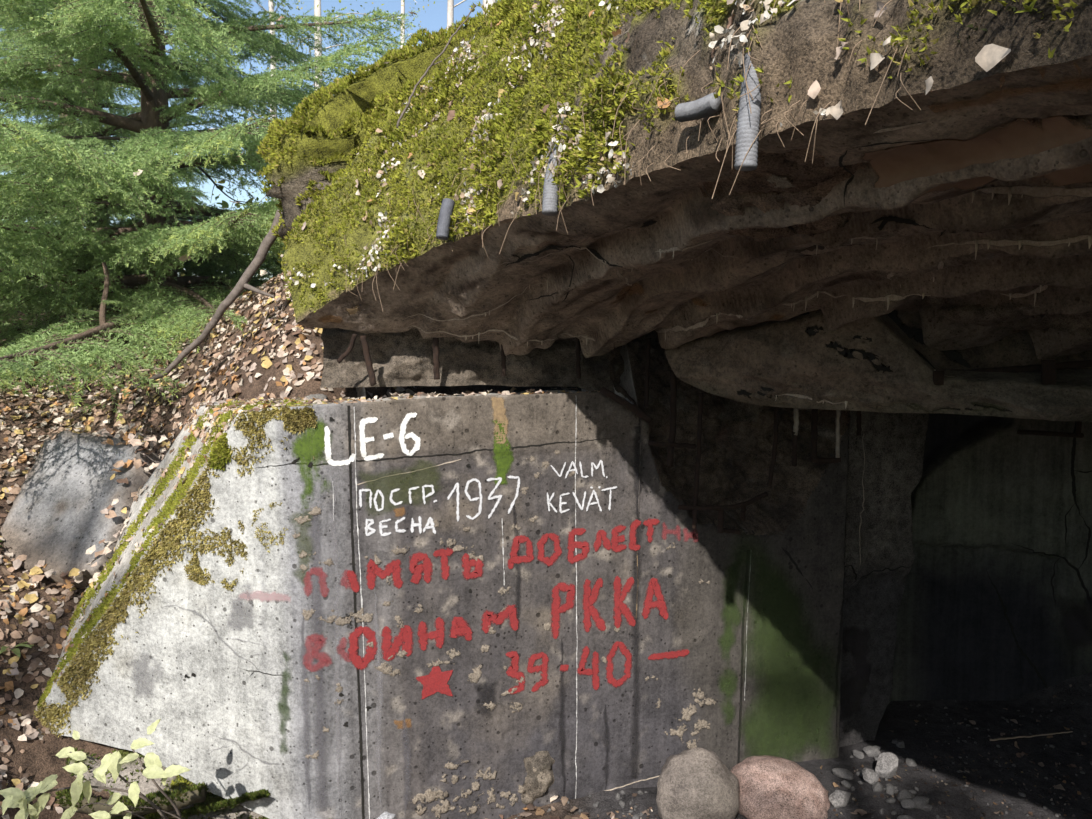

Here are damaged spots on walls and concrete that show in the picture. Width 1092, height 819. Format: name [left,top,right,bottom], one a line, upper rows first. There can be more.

spalling [698,148,868,242]
crack [506,245,623,302]
water stain [782,272,931,311]
water stain [928,234,1092,260]
crack [1014,421,1092,607]